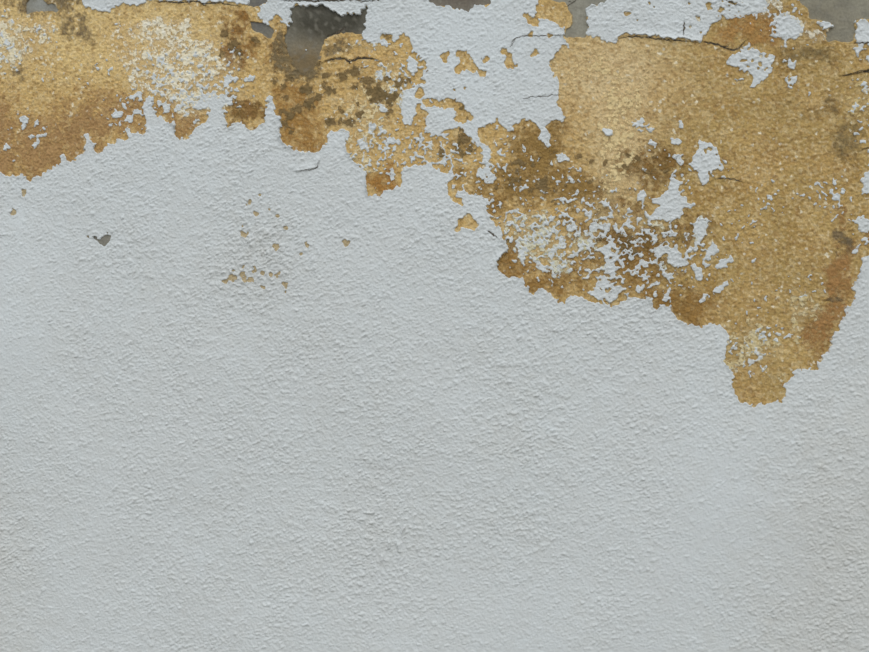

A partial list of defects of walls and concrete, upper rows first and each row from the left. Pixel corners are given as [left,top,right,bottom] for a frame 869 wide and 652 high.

crack [624,23,686,42]
crack [704,41,745,51]
crack [325,56,373,64]
peeling [0,0,869,407]